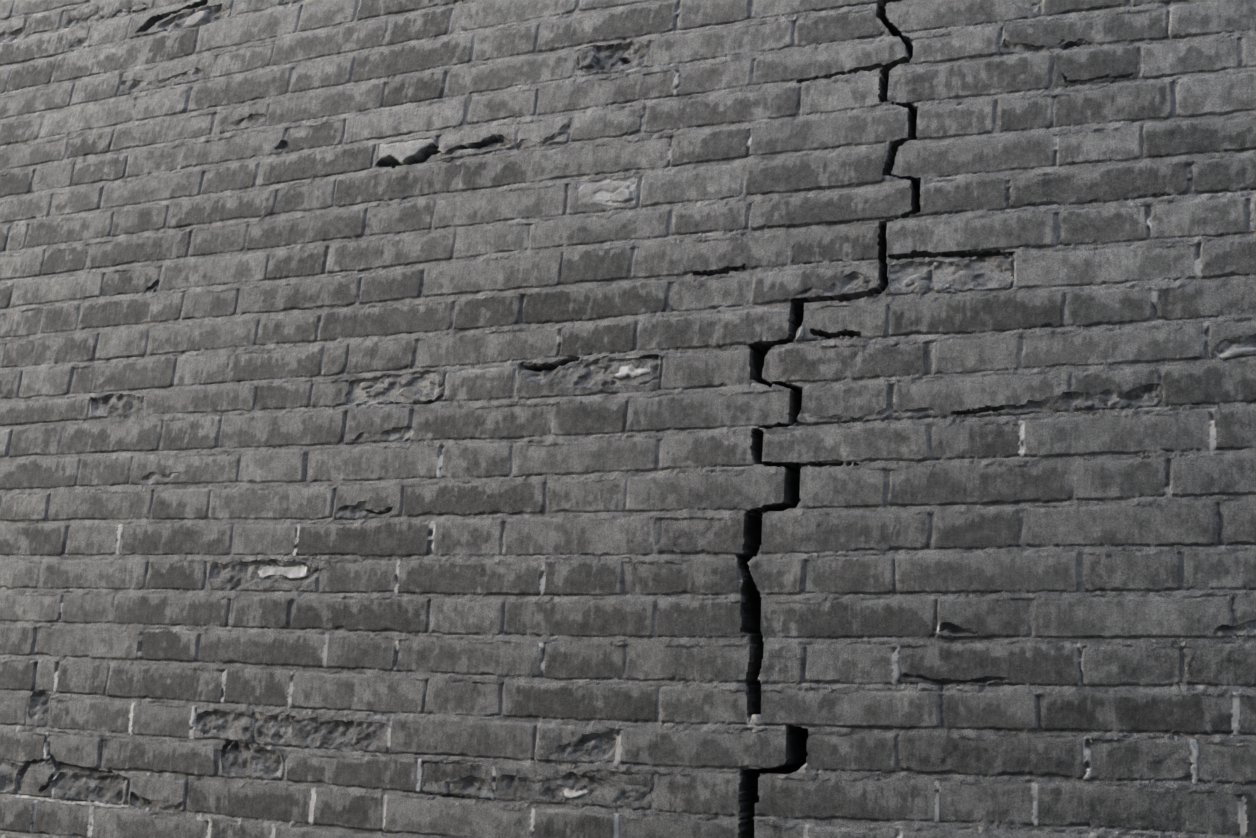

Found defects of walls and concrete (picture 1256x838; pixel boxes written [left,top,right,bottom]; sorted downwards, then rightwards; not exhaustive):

spalling [157,3,232,32]
spalling [575,38,651,74]
spalling [375,120,574,168]
peeling [794,255,1014,303]
peeling [346,370,446,407]
peeling [516,354,662,389]
crack [735,0,1015,838]
spalling [204,557,331,593]